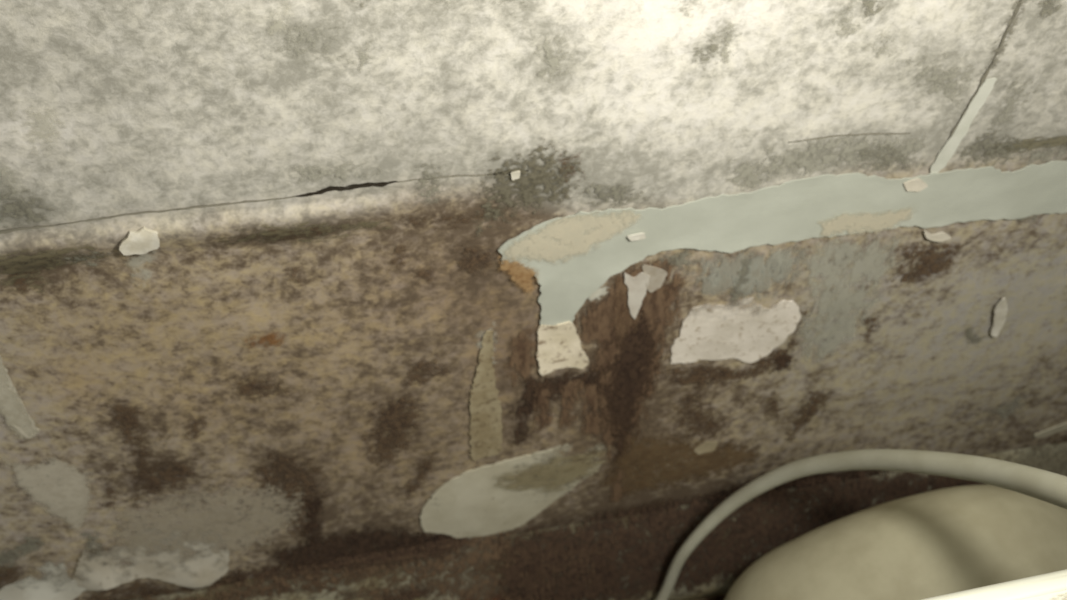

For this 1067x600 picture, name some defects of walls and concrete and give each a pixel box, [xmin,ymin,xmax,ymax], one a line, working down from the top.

crack [949,0,1061,139]
water stain [0,246,110,292]
crack [0,169,529,234]
water stain [220,221,389,243]
water stain [409,146,643,232]
peeling [498,161,1067,376]
water stain [893,239,970,284]
water stain [81,246,985,600]
water stain [1016,437,1067,476]
peeling [5,457,93,528]
water stain [0,537,43,585]
peeling [0,485,304,600]